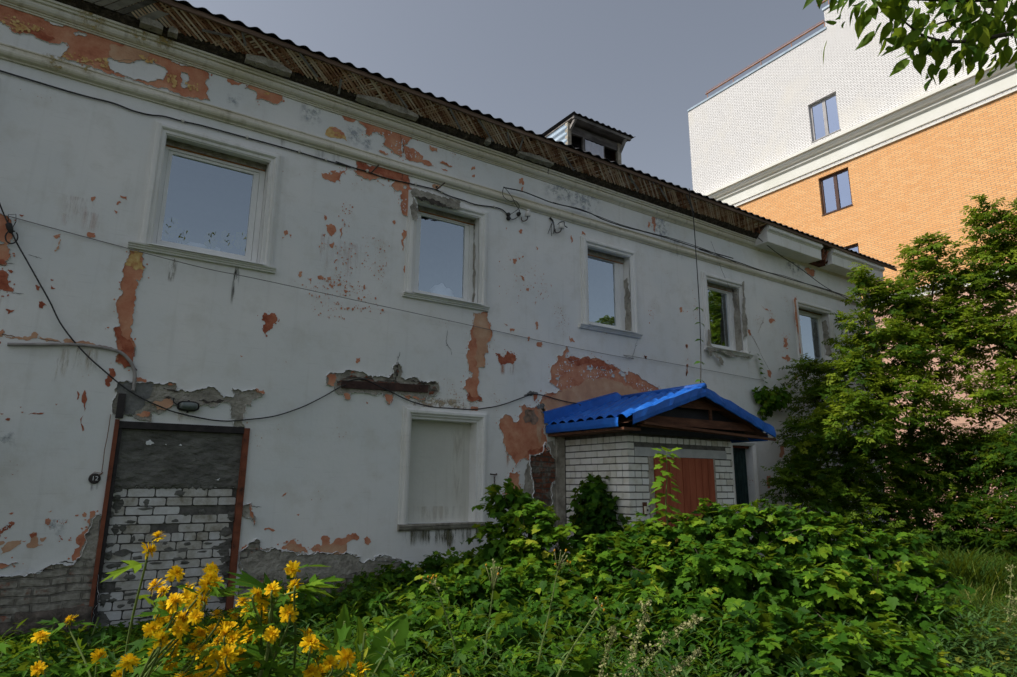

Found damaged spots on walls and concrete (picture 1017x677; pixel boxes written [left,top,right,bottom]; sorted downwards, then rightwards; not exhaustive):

peeling [0,5,213,101]
peeling [325,116,452,171]
peeling [0,213,24,297]
peeling [298,203,390,319]
flaking render [322,161,461,250]
peeling [0,329,95,345]
flaking render [105,250,265,427]
flaking render [325,358,440,405]
peeling [460,224,517,411]
peeling [496,336,661,527]
flaking render [0,510,102,623]
flaking render [236,503,409,607]